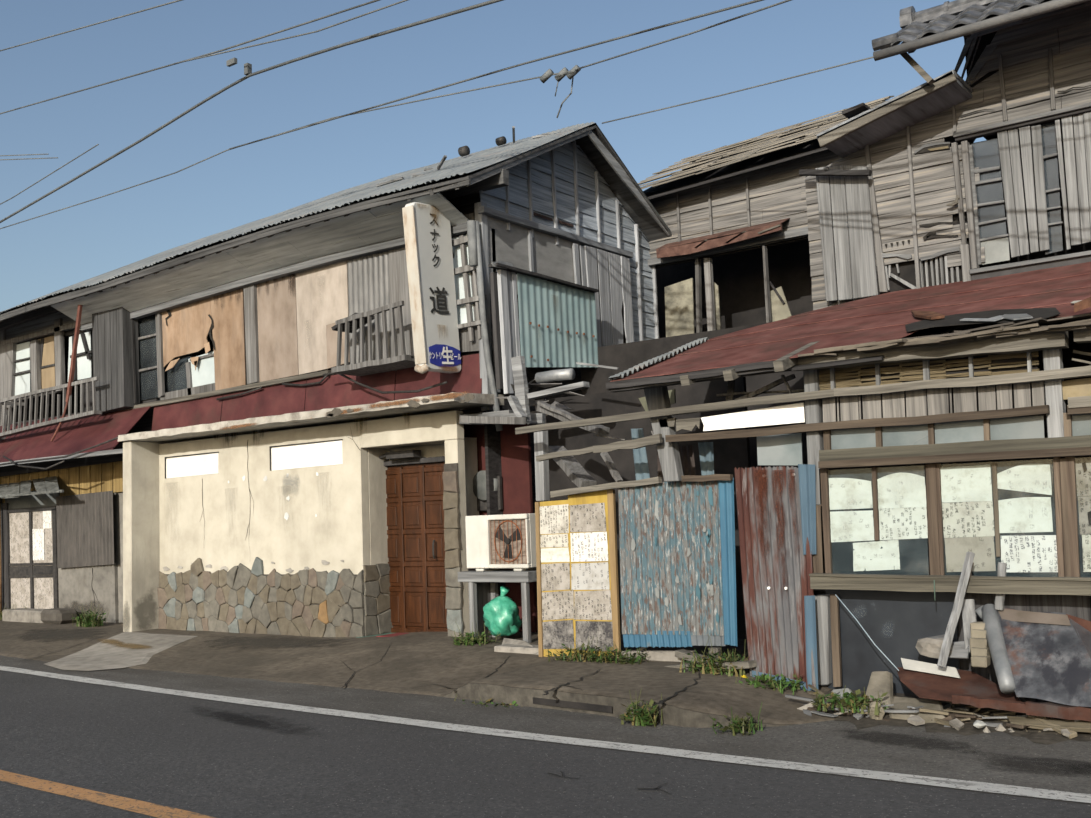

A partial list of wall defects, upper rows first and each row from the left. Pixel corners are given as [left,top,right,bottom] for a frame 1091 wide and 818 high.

peeling [165,342,210,371]
corrosion [341,392,466,414]
corrosion [755,469,796,585]